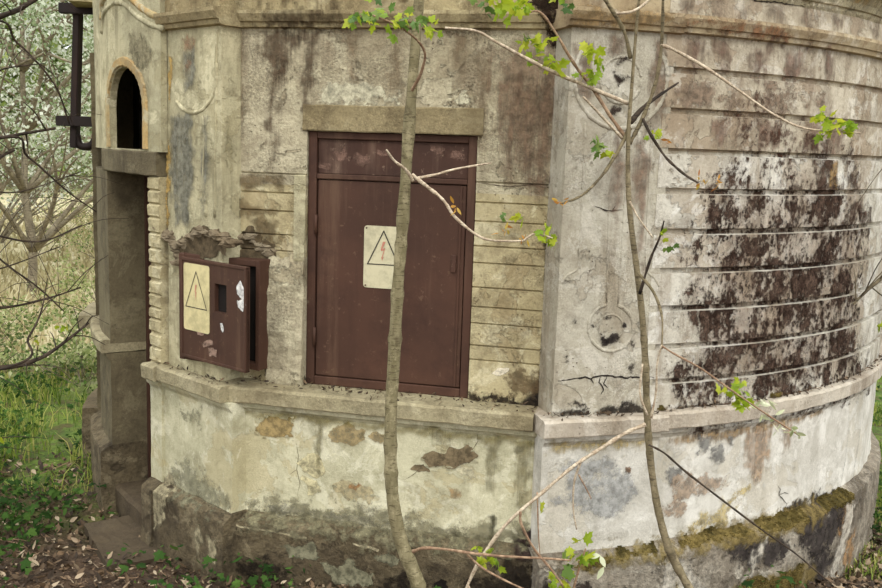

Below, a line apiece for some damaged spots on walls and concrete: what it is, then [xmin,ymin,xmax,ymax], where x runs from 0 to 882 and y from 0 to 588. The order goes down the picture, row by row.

crack [754,0,804,8]
leakage [262,0,340,111]
leakage [170,113,208,224]
spalling [179,225,226,259]
spalling [240,225,276,259]
leakage [650,41,873,409]
crack [561,375,654,394]
peeling [254,415,294,439]
peeling [328,422,384,446]
spalling [411,443,478,472]
leakage [665,467,727,518]
leakage [720,488,855,588]